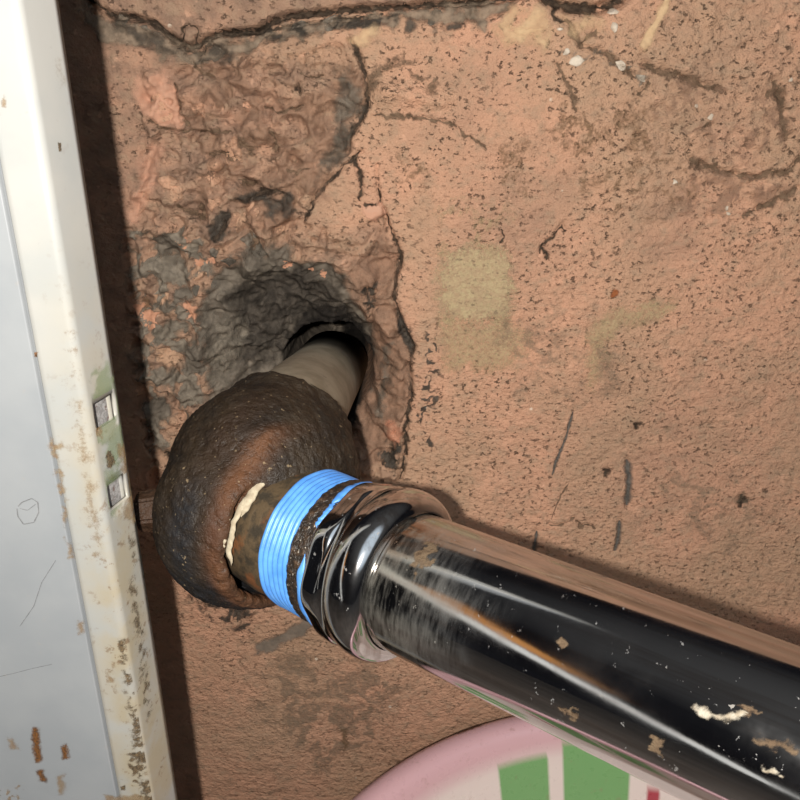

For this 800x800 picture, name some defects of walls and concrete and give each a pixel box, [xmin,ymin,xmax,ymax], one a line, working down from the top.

crack [148,83,196,133]
flaking render [79,0,513,470]
crack [89,0,513,56]
crack [304,41,487,479]